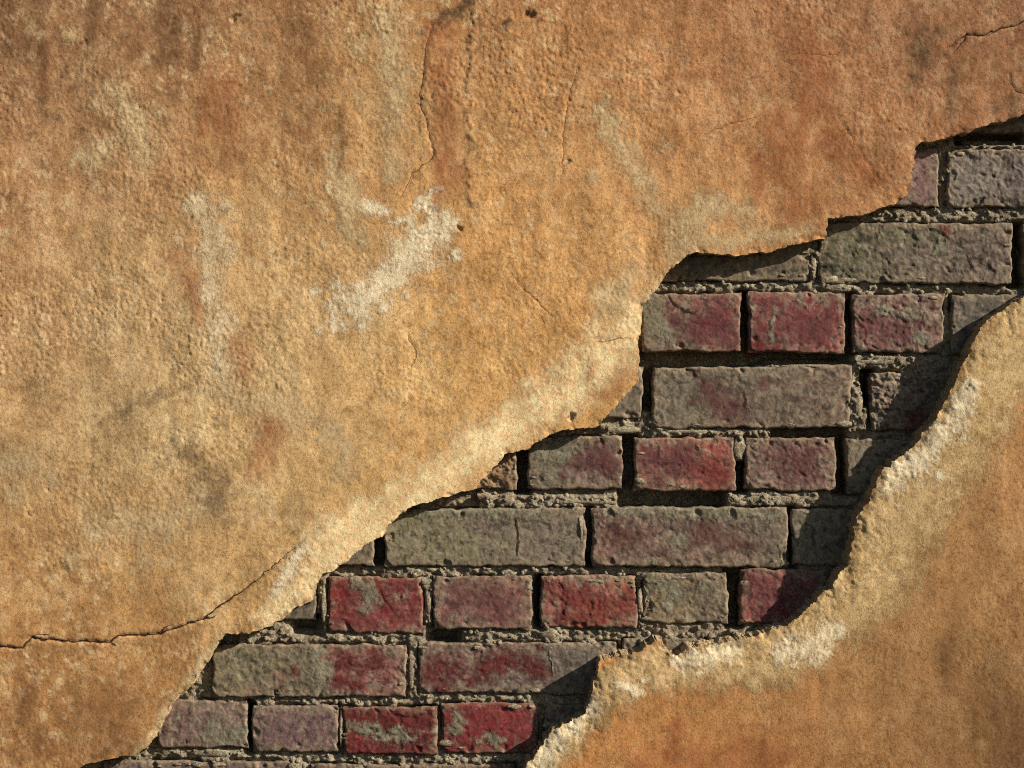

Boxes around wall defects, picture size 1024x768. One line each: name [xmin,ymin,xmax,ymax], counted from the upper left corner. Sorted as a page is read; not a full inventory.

crack [950,21,1024,52]
peeling [70,81,166,176]
crack [400,27,437,201]
crack [561,64,578,177]
spalling [915,114,1024,148]
peeling [174,191,358,482]
peeling [249,95,909,633]
peeling [84,480,222,570]
peeling [343,295,1024,768]
crack [0,541,303,649]
peeling [133,630,228,756]
peeling [325,648,390,694]